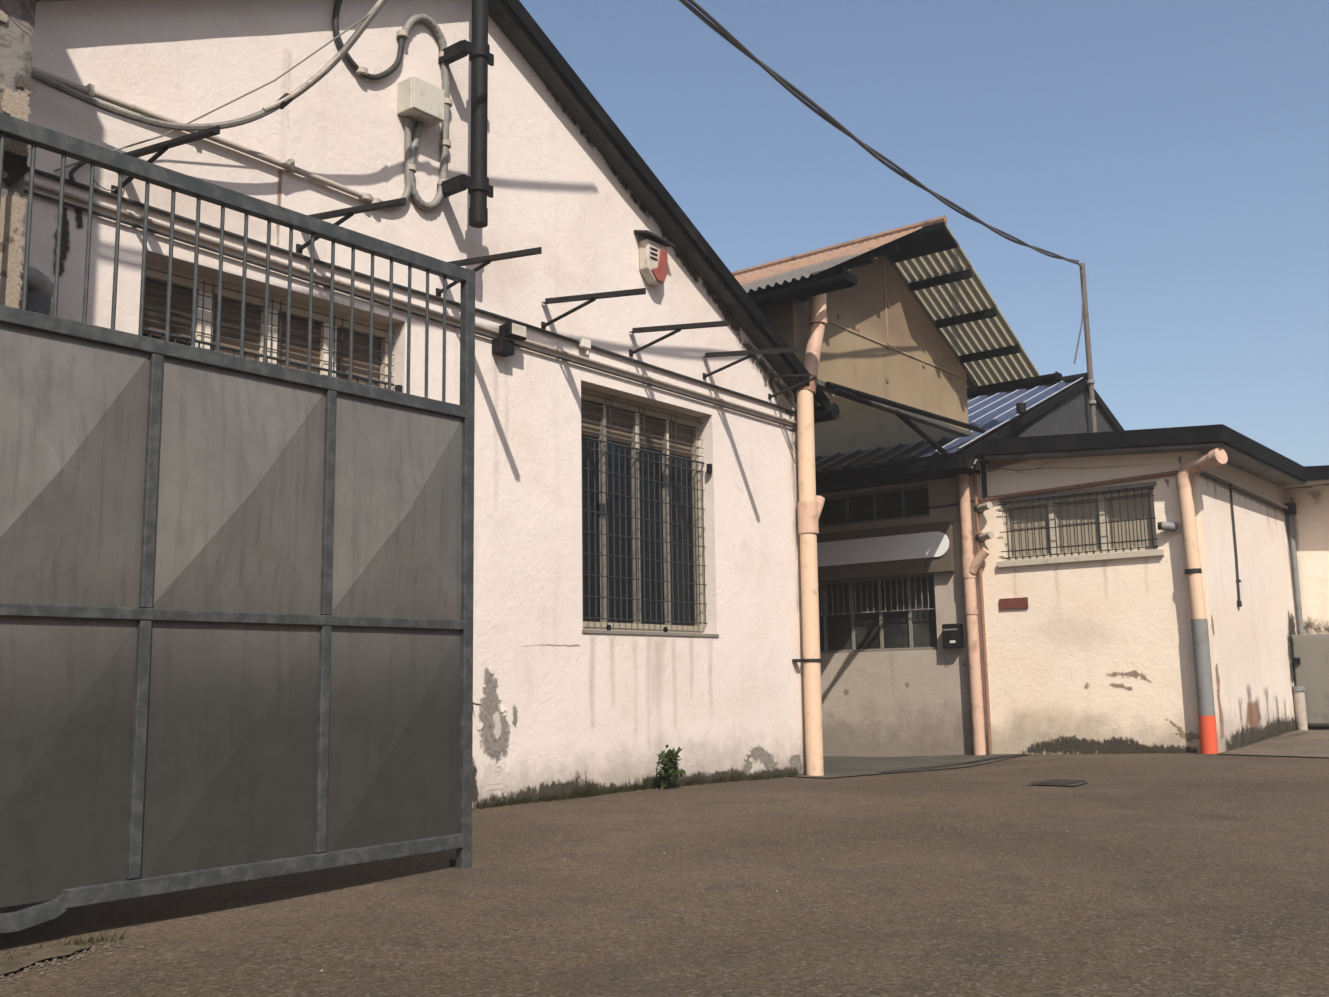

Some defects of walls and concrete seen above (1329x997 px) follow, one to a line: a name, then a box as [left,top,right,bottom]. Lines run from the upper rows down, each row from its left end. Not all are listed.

peeling [0,78,31,122]
peeling [0,137,31,308]
spalling [1107,671,1153,690]
peeling [477,666,517,767]
damp [472,758,657,808]
damp [677,767,798,785]
spalling [743,743,803,779]
damp [1022,735,1197,755]
damp [1226,716,1297,751]